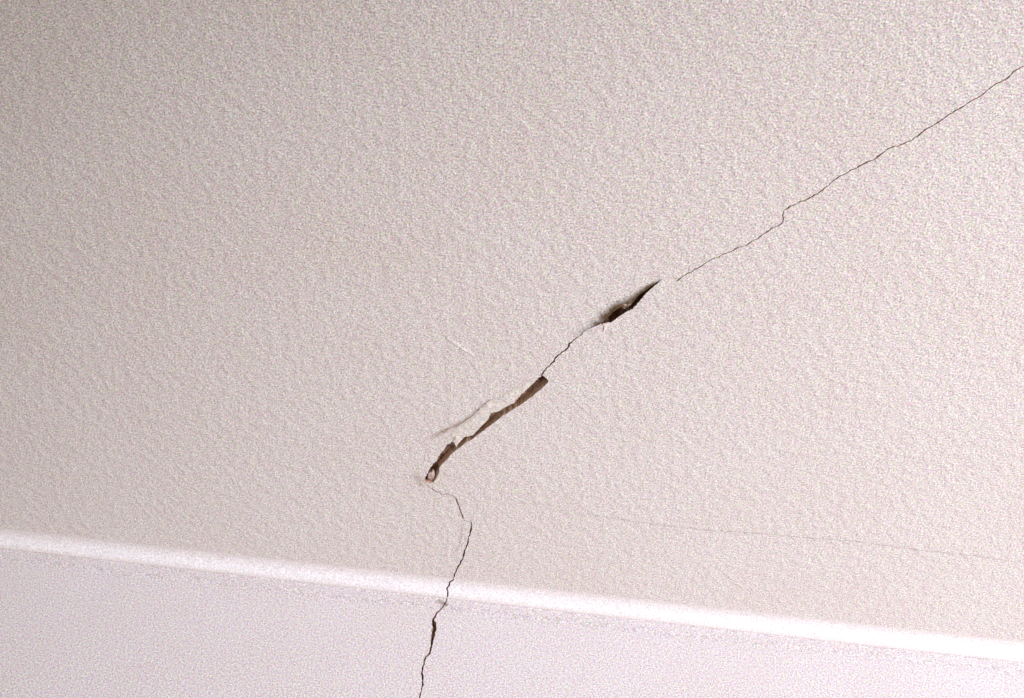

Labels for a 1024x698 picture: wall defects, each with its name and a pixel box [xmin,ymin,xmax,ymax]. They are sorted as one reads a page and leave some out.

crack [676,66,1024,282]
crack [541,333,583,377]
crack [419,482,472,698]